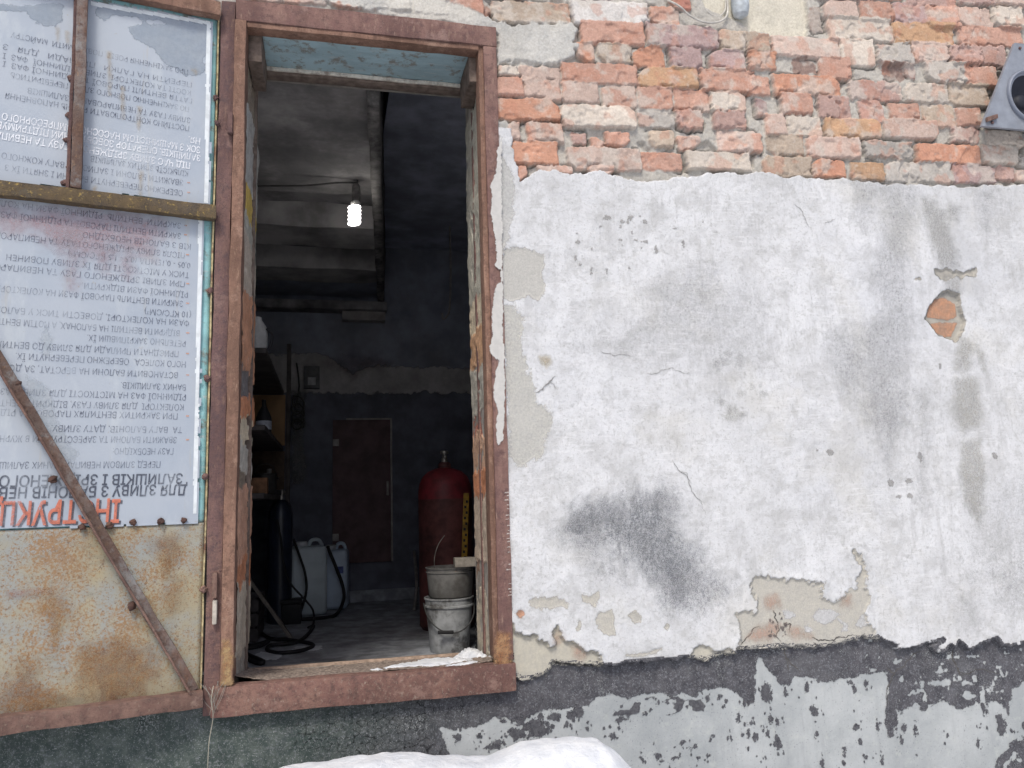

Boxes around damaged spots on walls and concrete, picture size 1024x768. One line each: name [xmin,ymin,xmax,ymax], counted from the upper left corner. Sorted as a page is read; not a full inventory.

peeling [501,157,553,467]
spalling [924,267,977,343]
rust [221,641,233,684]
spalling [510,596,603,681]
peeling [582,592,616,636]
peeling [628,610,642,624]
spalling [689,549,879,662]
peeling [475,681,824,768]
peeling [847,680,884,765]
peeling [895,715,919,745]
peeling [976,714,1024,750]